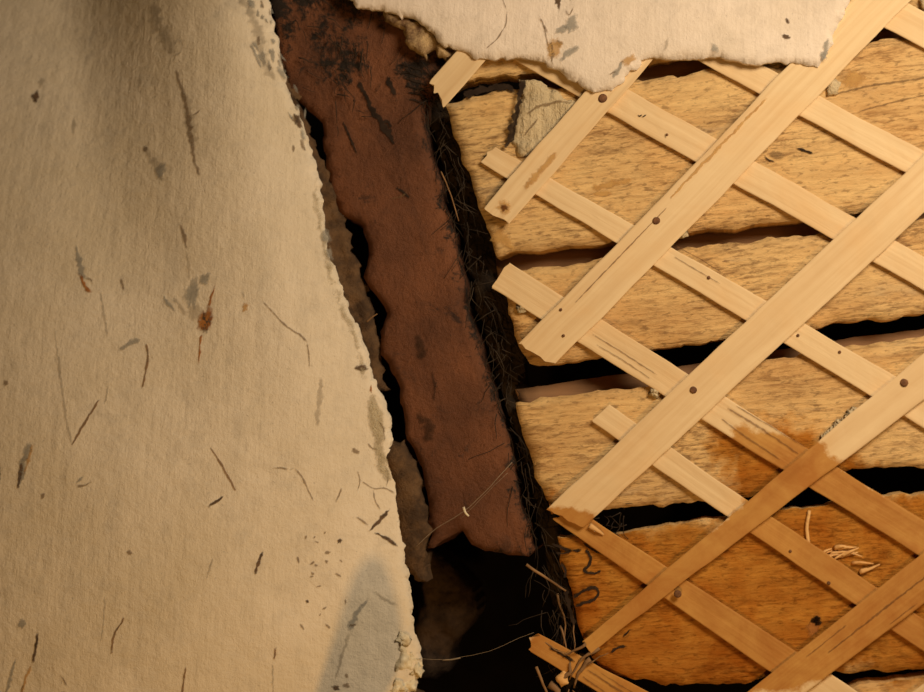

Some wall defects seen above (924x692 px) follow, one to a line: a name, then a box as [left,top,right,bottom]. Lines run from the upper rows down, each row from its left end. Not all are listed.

spalling [251,37,286,77]
spalling [548,16,578,59]
spalling [289,85,306,151]
rust [198,288,215,360]
spalling [368,387,390,479]
spalling [390,630,425,692]
peeling [556,671,569,687]